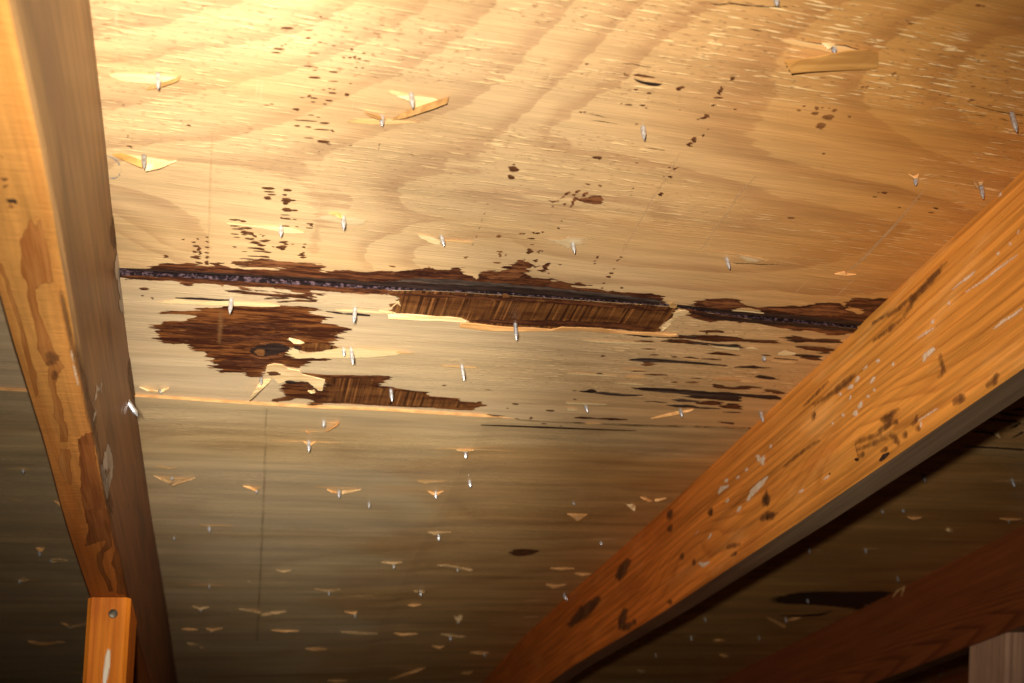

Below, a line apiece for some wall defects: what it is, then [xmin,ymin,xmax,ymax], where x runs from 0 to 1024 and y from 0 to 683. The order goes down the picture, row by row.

damp [262,187,313,229]
damp [111,219,668,314]
damp [163,322,296,331]
peeling [326,300,689,336]
damp [210,357,283,367]
peeling [266,363,325,394]
damp [469,273,936,424]
damp [60,293,114,514]
damp [854,411,920,461]